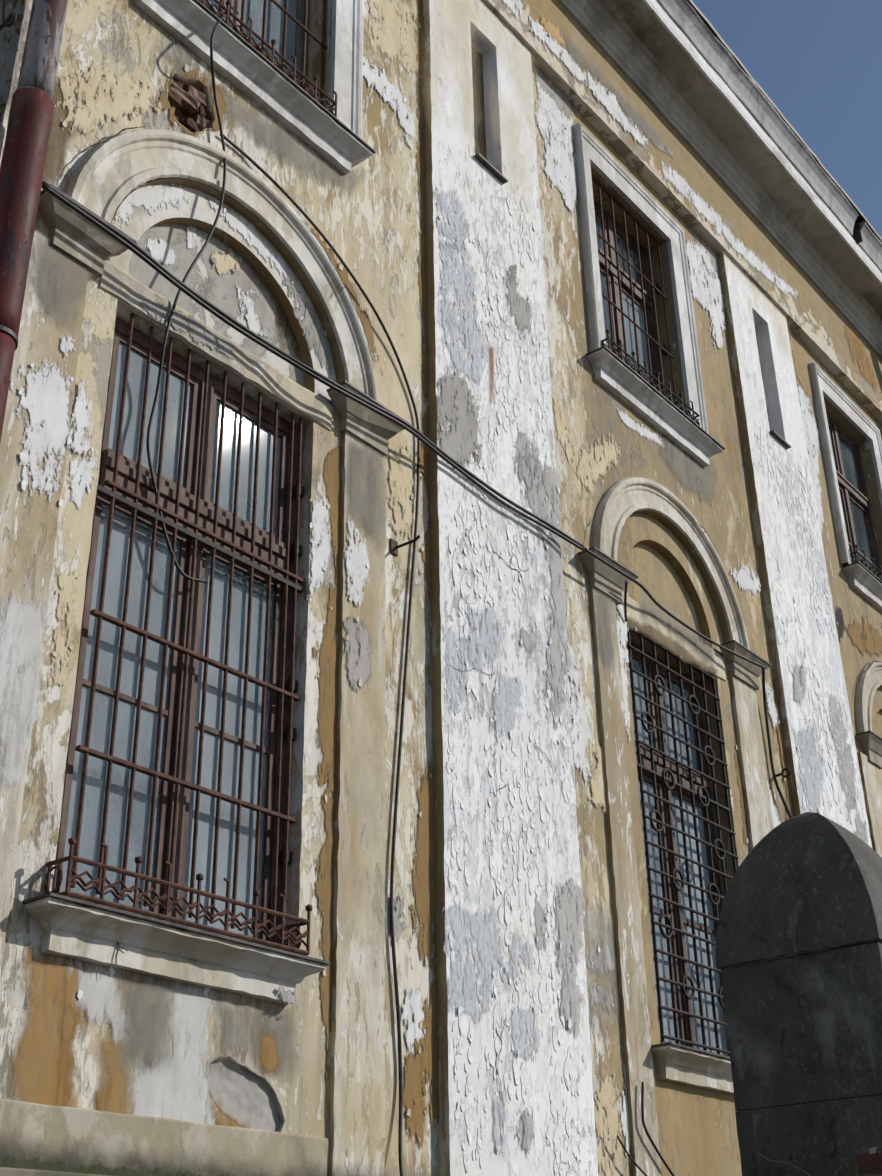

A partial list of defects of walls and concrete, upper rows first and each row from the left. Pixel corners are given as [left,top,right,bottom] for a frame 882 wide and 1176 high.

peeling [54,63,228,137]
peeling [146,225,198,266]
peeling [141,298,235,359]
peeling [208,197,334,374]
peeling [503,0,798,349]
peeling [10,335,99,512]
peeling [752,327,826,547]
peeling [363,0,631,1176]
peeling [307,437,378,1081]
peeling [730,559,882,845]
peeling [68,958,129,1044]
peeling [127,984,286,1133]